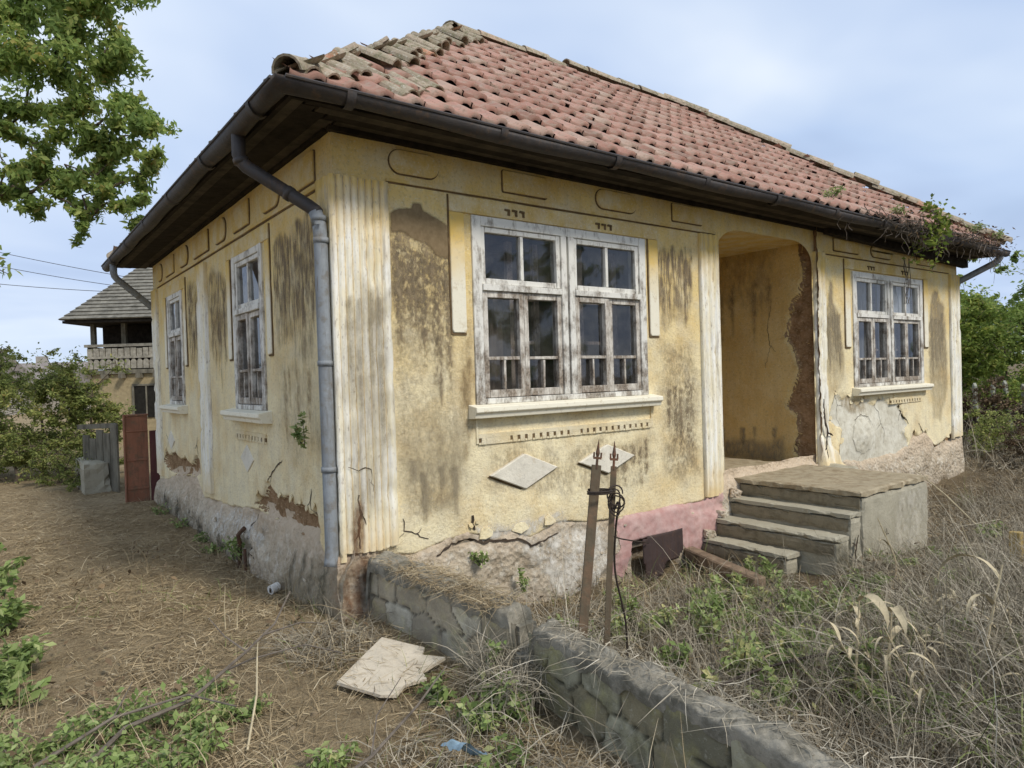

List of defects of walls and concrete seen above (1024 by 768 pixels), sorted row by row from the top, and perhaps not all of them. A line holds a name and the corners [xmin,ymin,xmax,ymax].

leakage [187,274,226,350]
leakage [274,214,315,329]
leakage [370,203,452,421]
leakage [658,247,692,307]
flaking render [780,227,951,462]
leakage [929,291,947,378]
flaking render [164,447,201,477]
leakage [667,385,695,469]
flaking render [213,476,320,540]
crack [348,467,374,549]